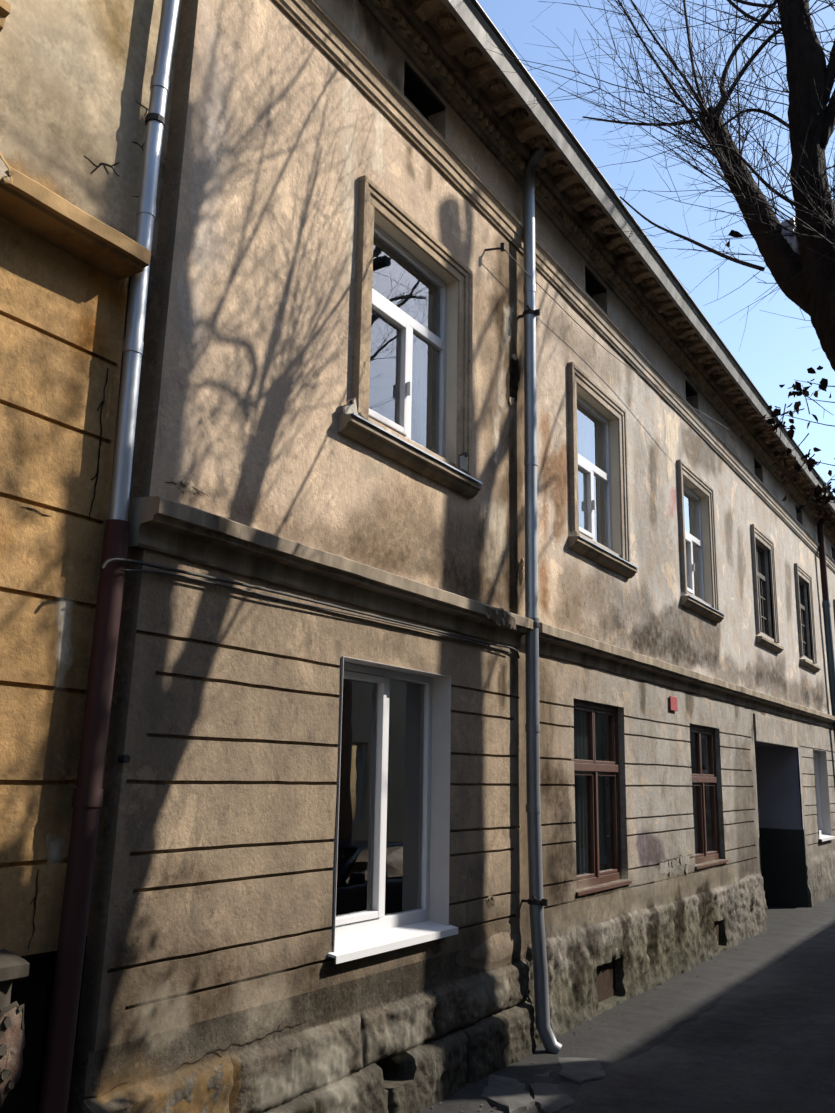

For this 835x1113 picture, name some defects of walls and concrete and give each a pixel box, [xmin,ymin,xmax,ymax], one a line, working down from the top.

crack [89,368,109,520]
leakage [488,520,524,594]
leakage [59,600,69,663]
crack [27,869,39,949]